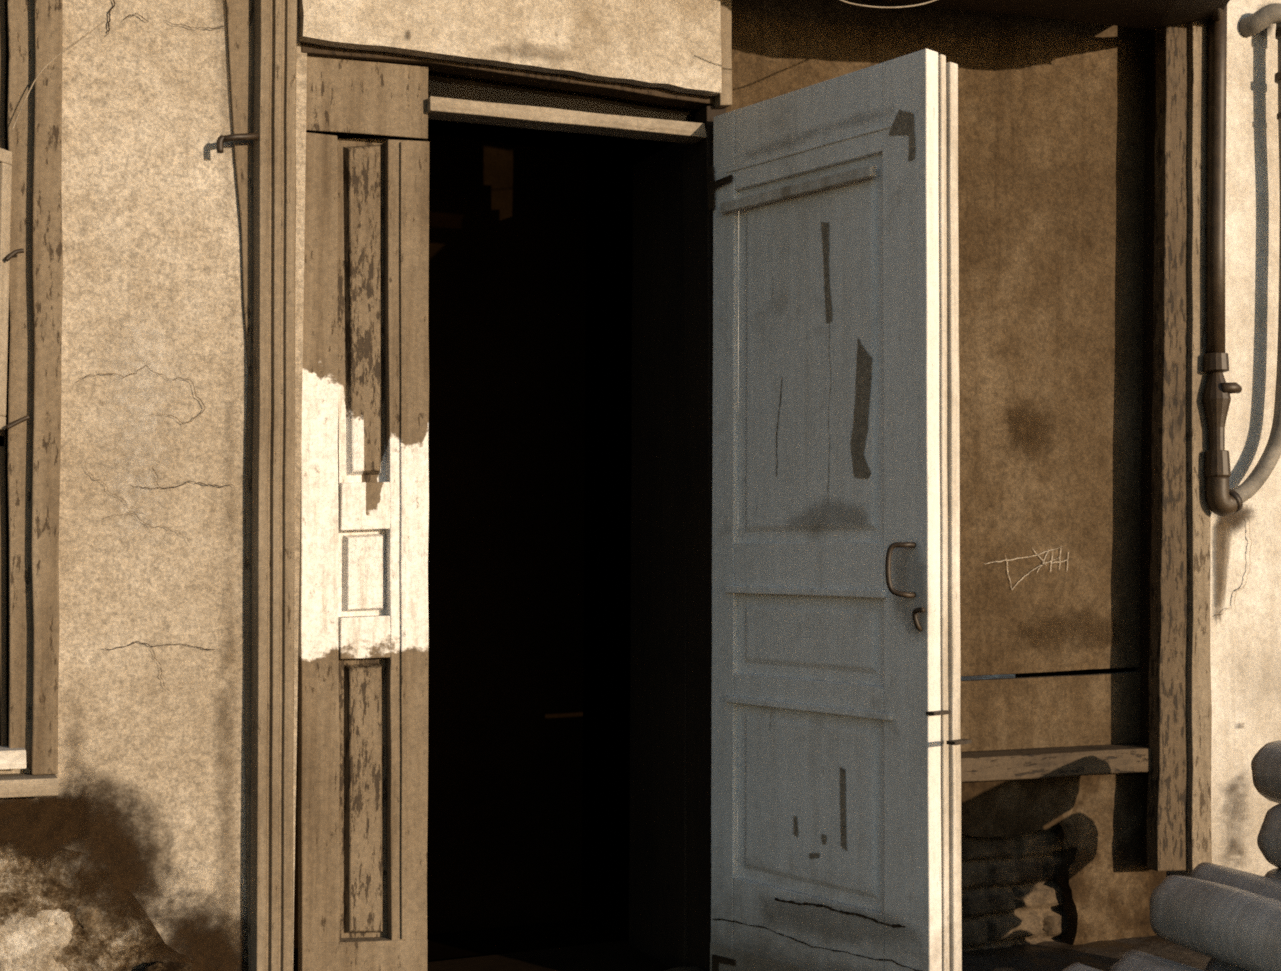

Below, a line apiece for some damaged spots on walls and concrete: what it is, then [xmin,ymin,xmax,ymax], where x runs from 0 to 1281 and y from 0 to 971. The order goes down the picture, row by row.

water stain [0,782,169,923]
spalling [0,844,193,971]
water stain [158,904,249,971]
spalling [961,824,1077,951]